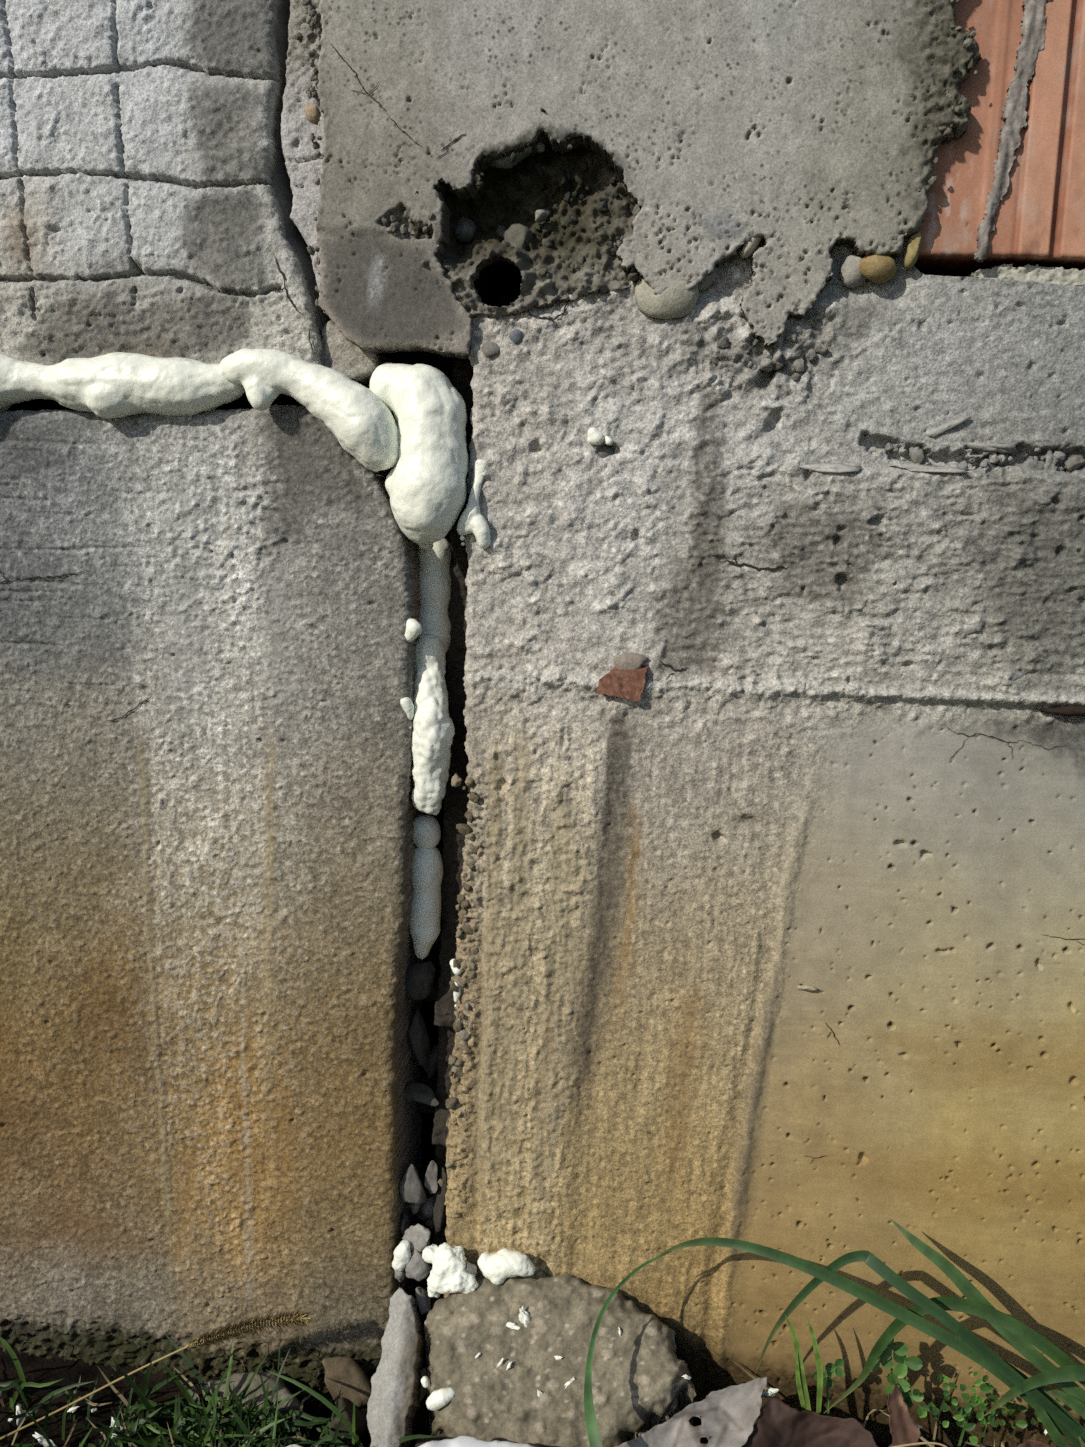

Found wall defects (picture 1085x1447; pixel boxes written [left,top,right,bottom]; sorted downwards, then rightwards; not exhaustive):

spalling [381,136,643,320]
leakage [477,758,527,1136]
leakage [538,728,629,1201]